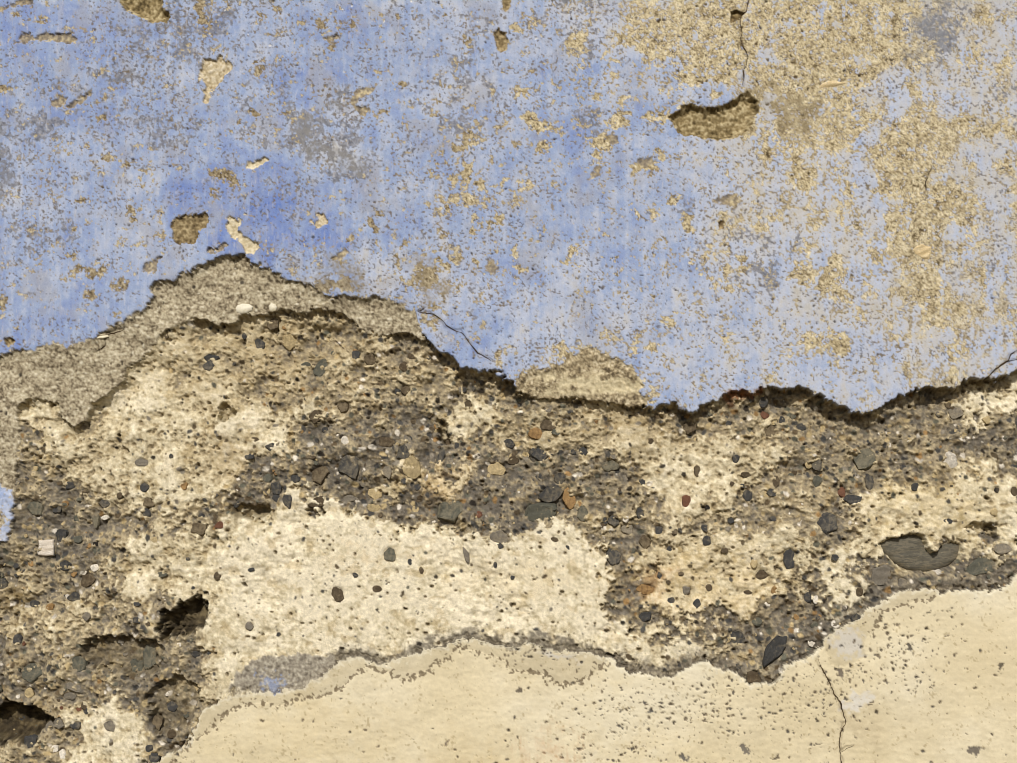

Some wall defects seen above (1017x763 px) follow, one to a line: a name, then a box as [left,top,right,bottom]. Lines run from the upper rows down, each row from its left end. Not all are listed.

spalling [120,0,171,24]
crack [740,0,749,85]
spalling [198,54,234,104]
peeling [628,0,935,150]
spalling [171,212,209,245]
spalling [205,216,260,255]
spalling [144,255,165,276]
spalling [486,259,500,275]
crack [418,308,493,362]
spalling [0,308,1017,763]
crack [818,660,852,763]